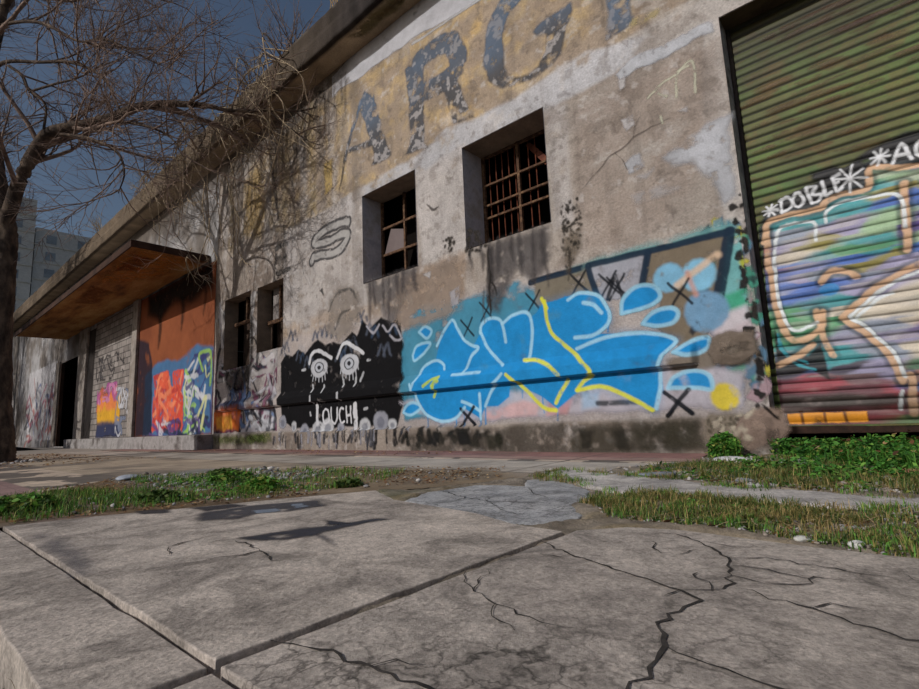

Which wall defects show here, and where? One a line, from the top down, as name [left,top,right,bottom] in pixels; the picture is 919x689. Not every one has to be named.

water stain [571,420,704,452]
crack [463,569,565,630]
crack [540,532,919,689]
crack [271,640,435,689]